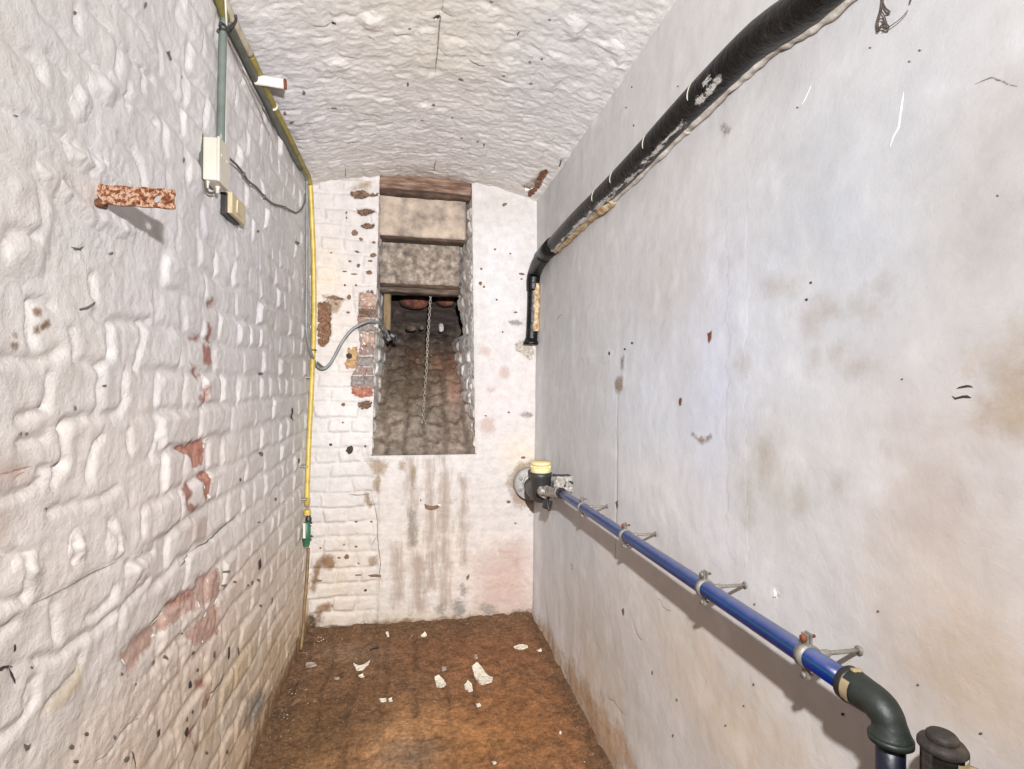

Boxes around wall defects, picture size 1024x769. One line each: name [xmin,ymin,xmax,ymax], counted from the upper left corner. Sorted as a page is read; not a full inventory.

crack [435,6,482,73]
spalling [523,169,549,197]
flaking render [316,295,344,347]
spalling [344,290,377,410]
spalling [175,437,212,500]
peeling [120,568,221,670]